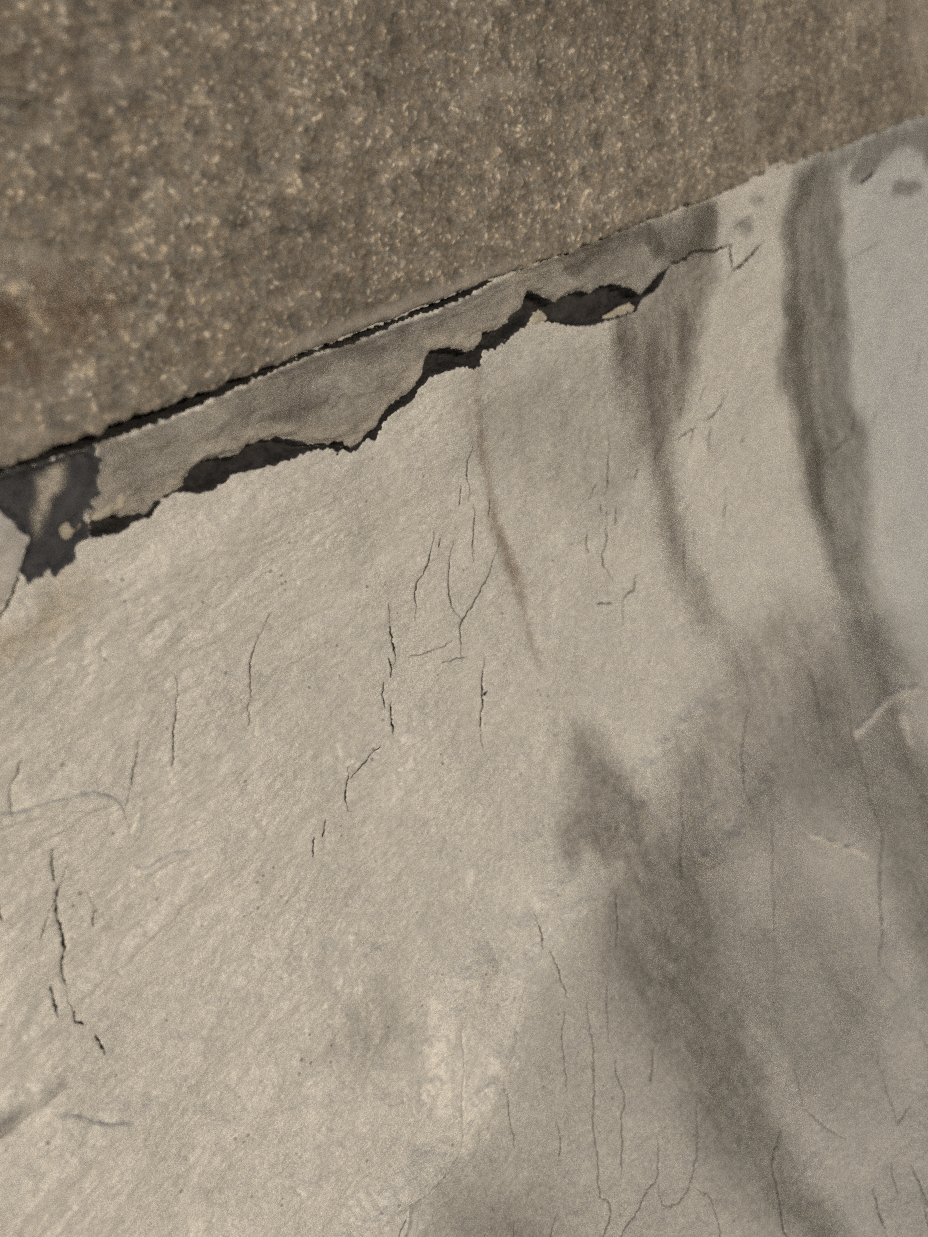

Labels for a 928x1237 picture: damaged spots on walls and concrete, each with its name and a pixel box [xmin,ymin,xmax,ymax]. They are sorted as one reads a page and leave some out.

spalling [0,206,709,584]
water stain [784,160,859,498]
crack [0,573,19,618]
crack [125,740,140,806]
crack [171,675,179,767]
crack [247,612,272,726]
crack [312,449,499,858]
crack [586,387,728,620]
crack [40,849,105,1056]
crack [535,915,721,1237]
crack [771,1068,847,1236]
crack [873,1163,928,1236]